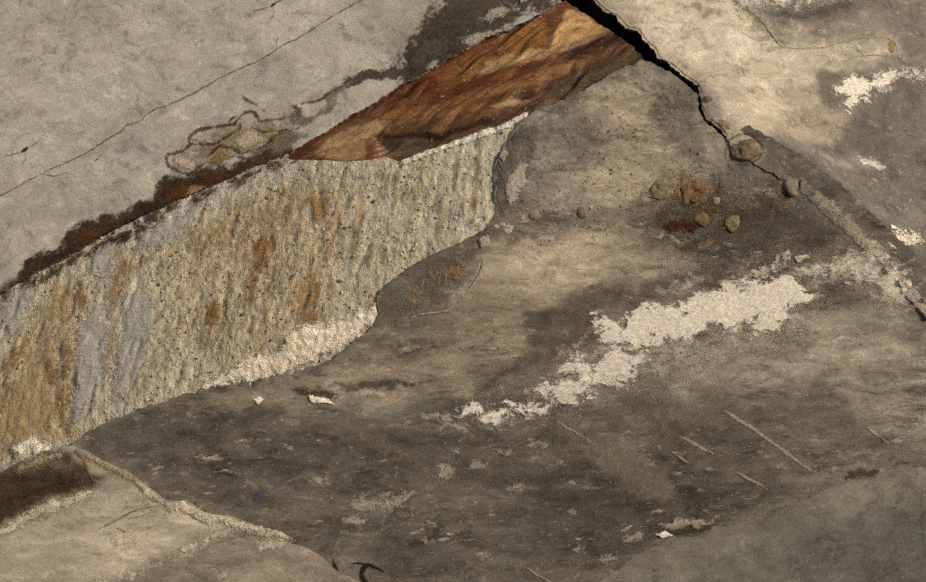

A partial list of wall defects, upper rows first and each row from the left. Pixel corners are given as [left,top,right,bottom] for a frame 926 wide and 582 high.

rust [0,280,88,458]
rust [0,146,293,376]
crack [0,1,359,196]
spalling [0,114,536,473]
rust [189,164,371,367]
rust [451,143,481,249]
crack [629,40,660,67]
leakage [422,225,926,430]
leakage [734,0,851,22]
leakage [858,156,886,170]
leakage [832,67,926,114]
leakage [342,490,417,530]